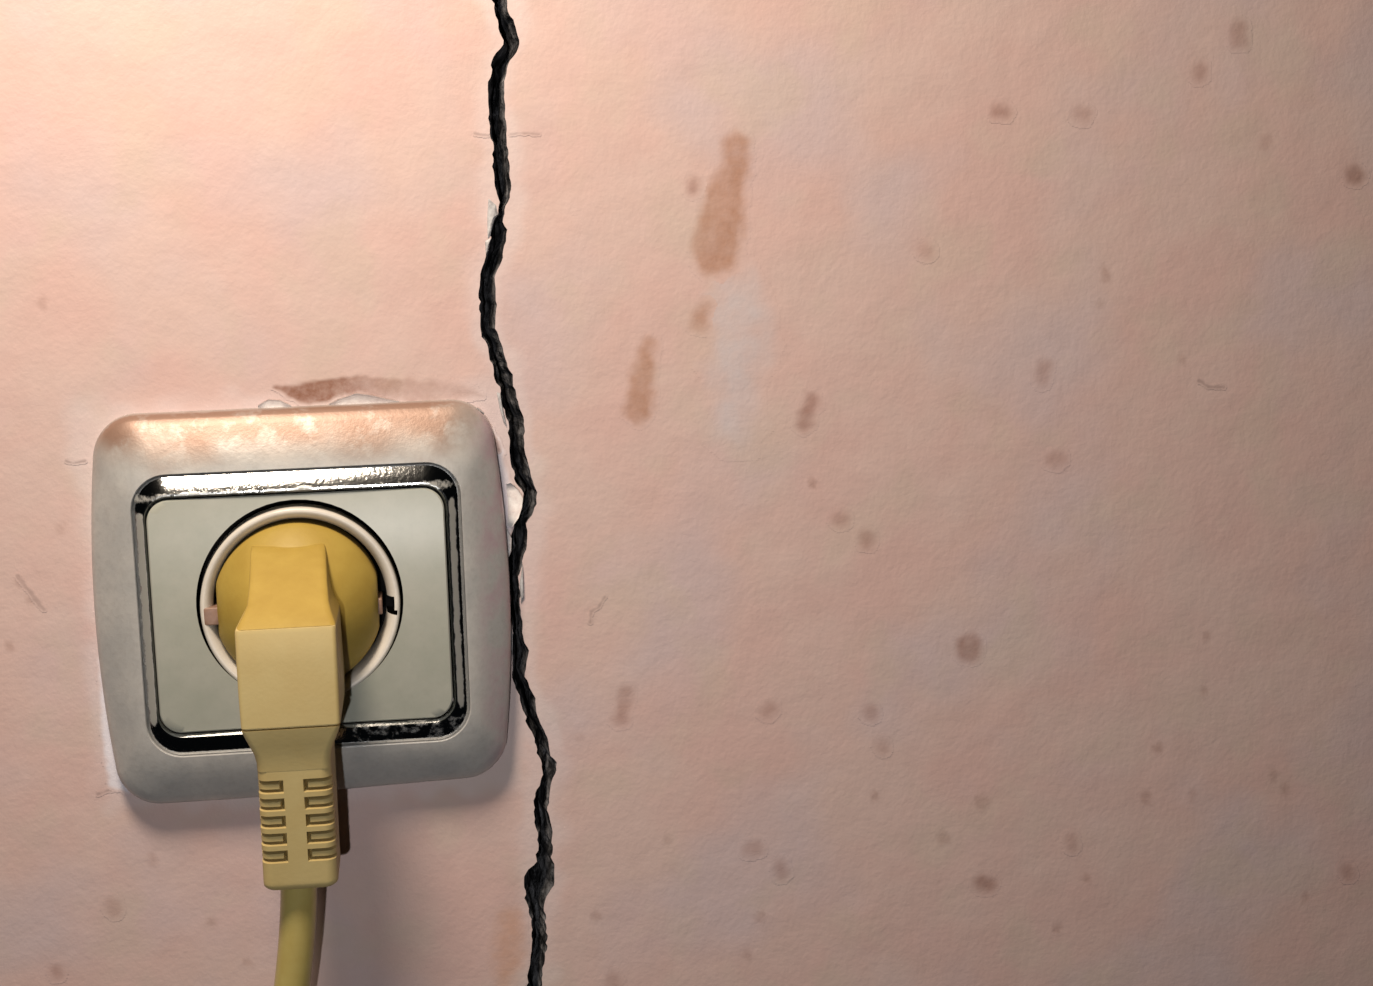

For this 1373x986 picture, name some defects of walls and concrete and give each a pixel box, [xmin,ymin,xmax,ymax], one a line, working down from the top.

damp [681,125,757,338]
damp [618,332,663,431]
crack [473,0,557,986]